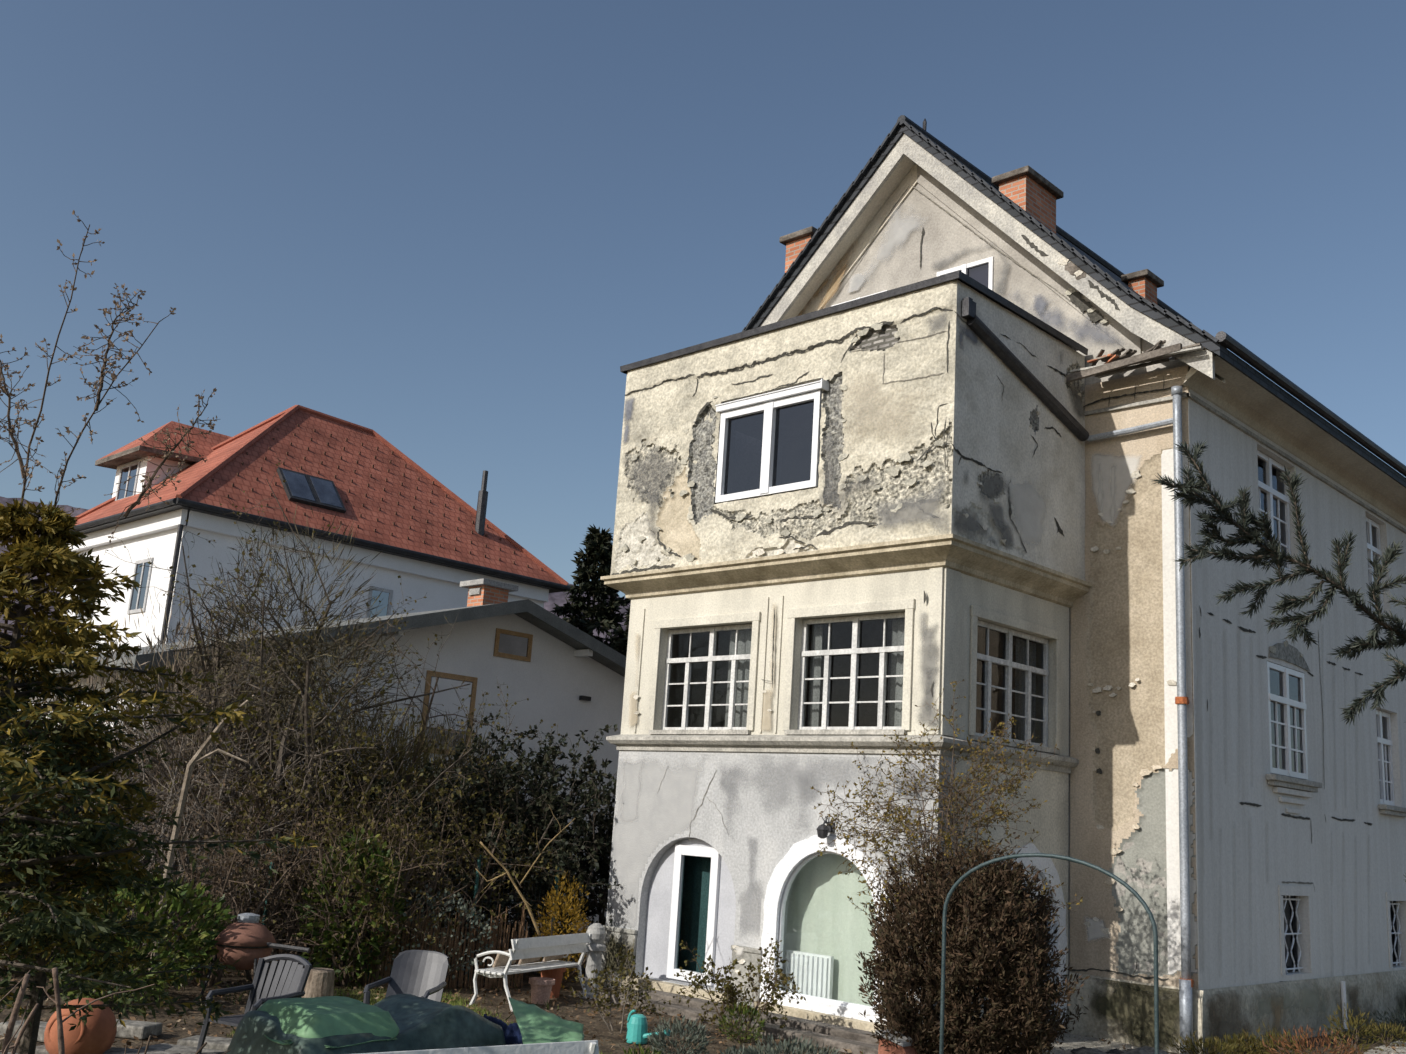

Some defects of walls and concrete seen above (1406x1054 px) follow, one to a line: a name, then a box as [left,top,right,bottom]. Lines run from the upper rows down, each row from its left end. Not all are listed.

crack [833,186,1102,324]
spalling [614,371,1025,572]
crack [625,307,1027,553]
spalling [848,322,902,353]
crack [1001,334,1066,377]
spalling [1029,405,1041,435]
crack [1083,376,1184,407]
peeling [1083,443,1198,977]